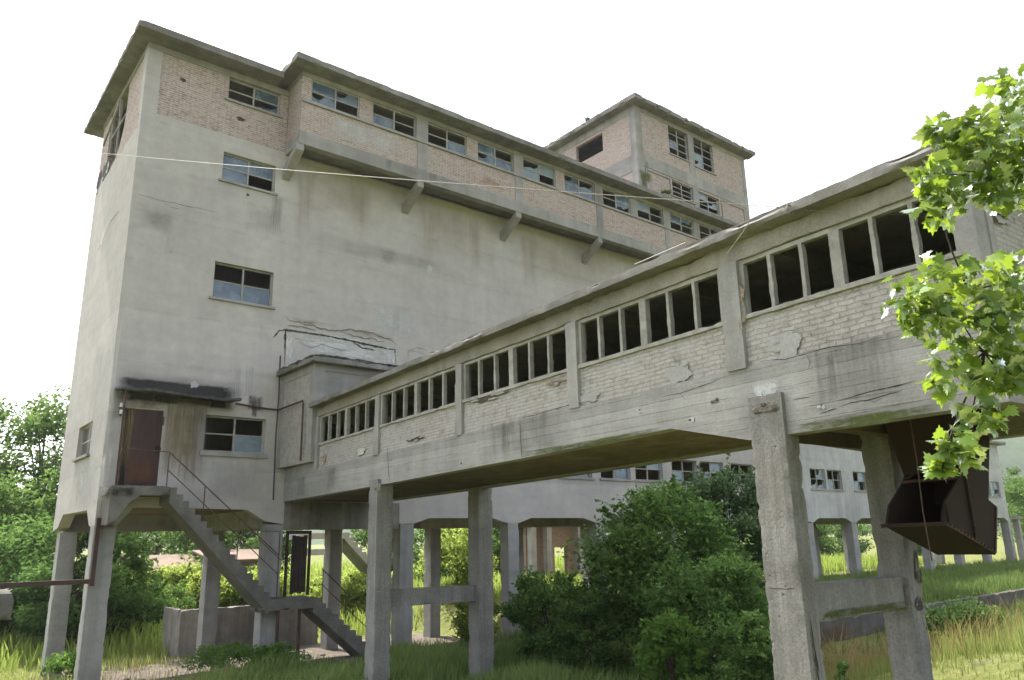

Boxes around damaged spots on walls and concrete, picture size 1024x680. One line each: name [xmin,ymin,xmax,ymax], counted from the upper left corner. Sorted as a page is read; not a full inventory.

crack [273,316,425,366]
crack [795,381,922,425]